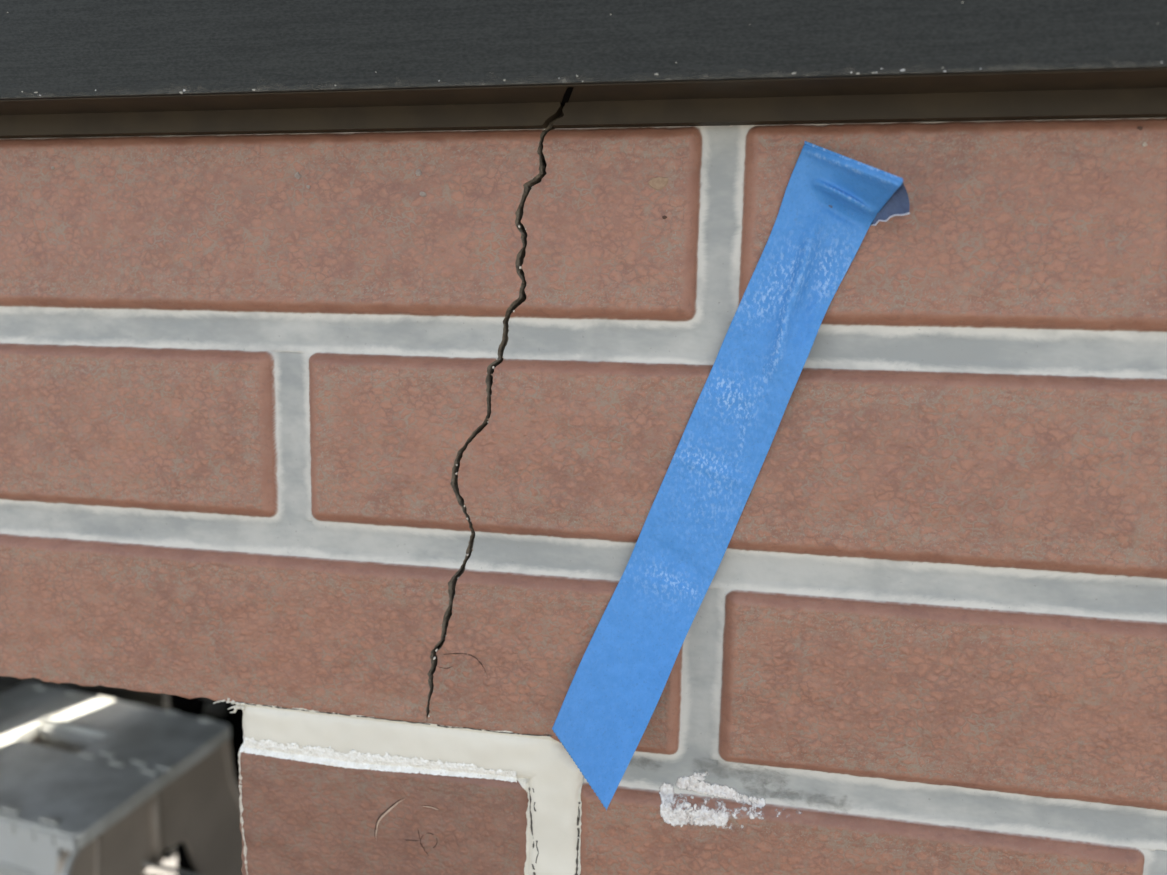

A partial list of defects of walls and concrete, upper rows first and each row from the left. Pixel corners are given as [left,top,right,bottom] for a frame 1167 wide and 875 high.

crack [238,87,574,737]